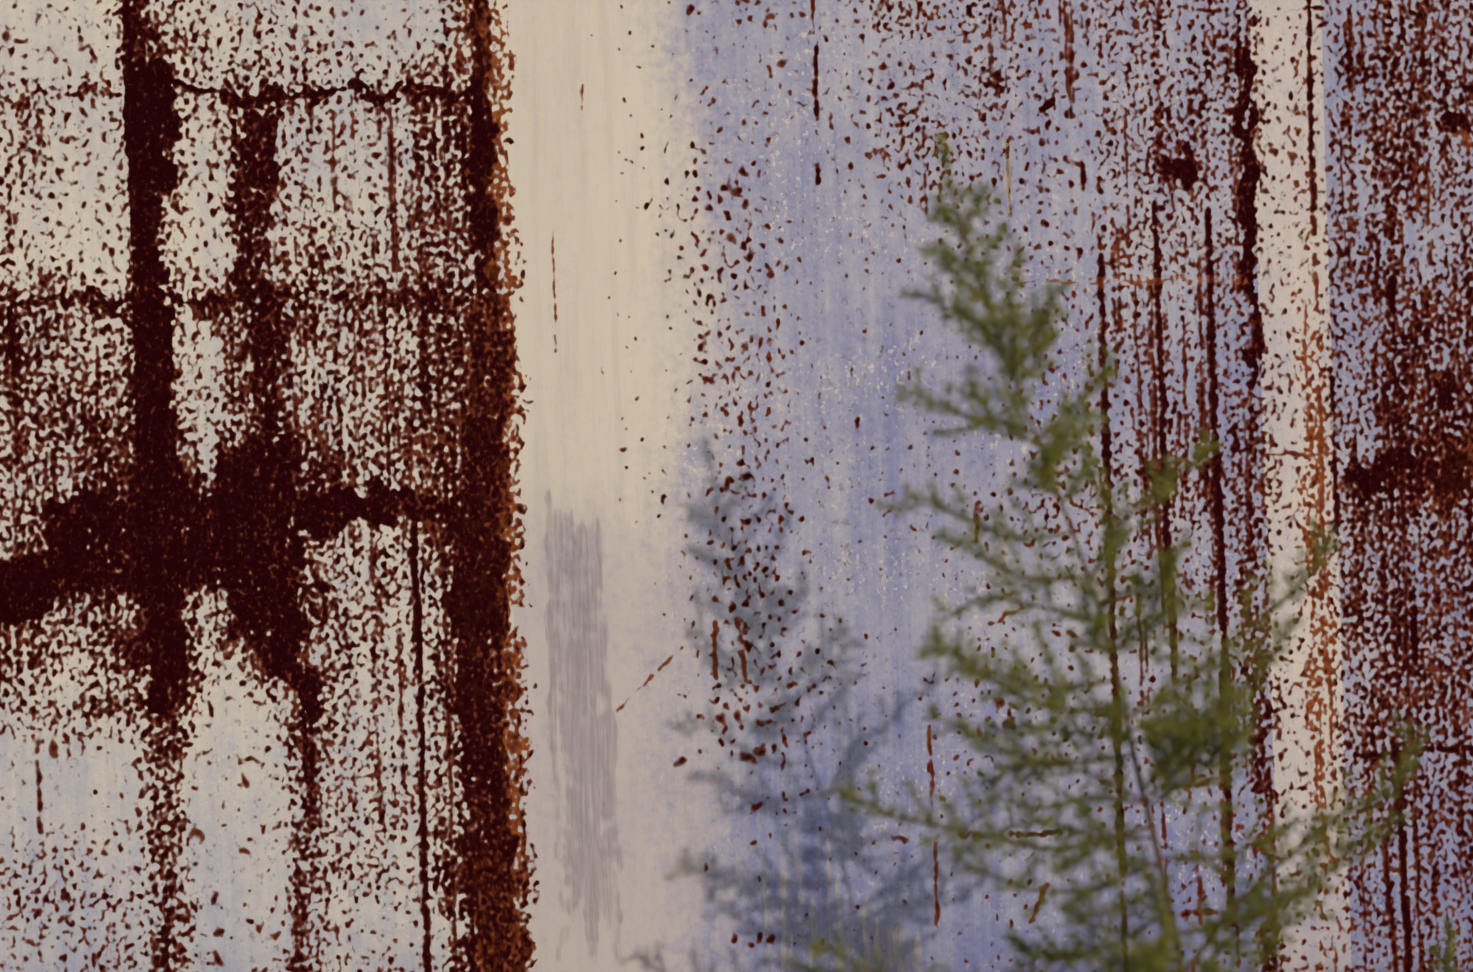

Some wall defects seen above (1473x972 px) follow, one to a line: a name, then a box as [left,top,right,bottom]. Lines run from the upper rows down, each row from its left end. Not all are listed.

rust [0,0,540,972]
rust [644,0,1473,972]